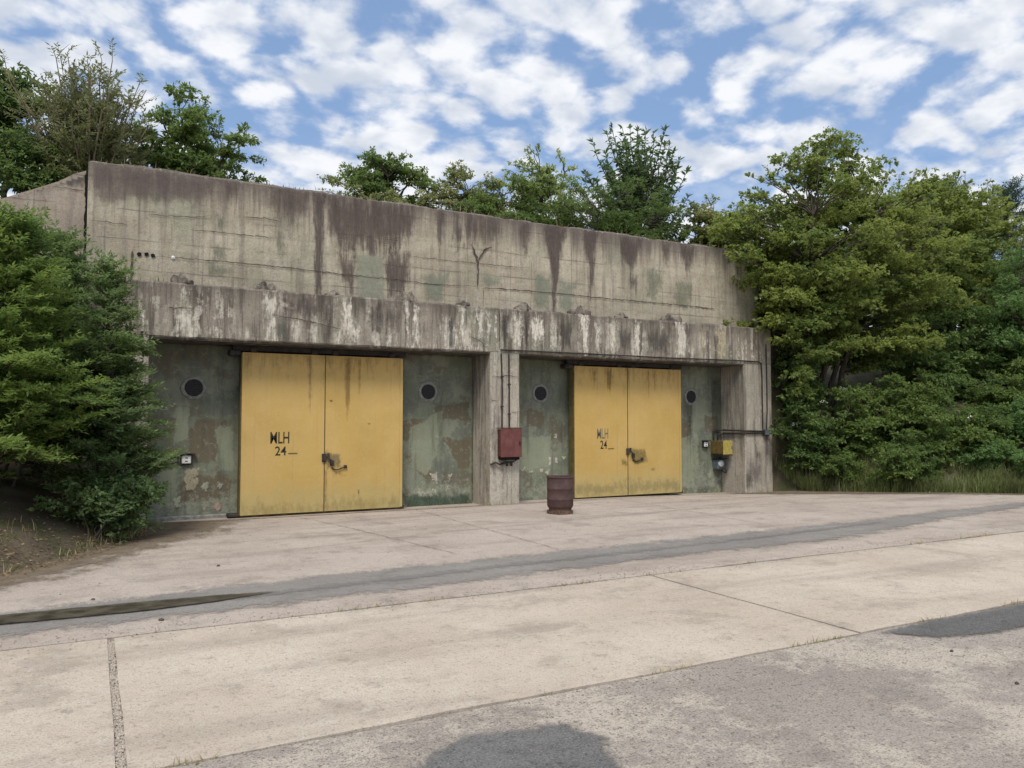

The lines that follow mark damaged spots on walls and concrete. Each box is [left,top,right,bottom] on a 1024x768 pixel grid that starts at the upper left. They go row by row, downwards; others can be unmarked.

spalling [170,274,194,285]
water stain [171,288,193,337]
water stain [264,193,420,348]
crack [130,244,713,349]
water stain [545,224,567,312]
water stain [444,307,686,360]
water stain [584,229,598,299]
water stain [621,236,641,283]
water stain [663,244,694,269]
water stain [702,328,726,359]
peeling [172,467,229,512]